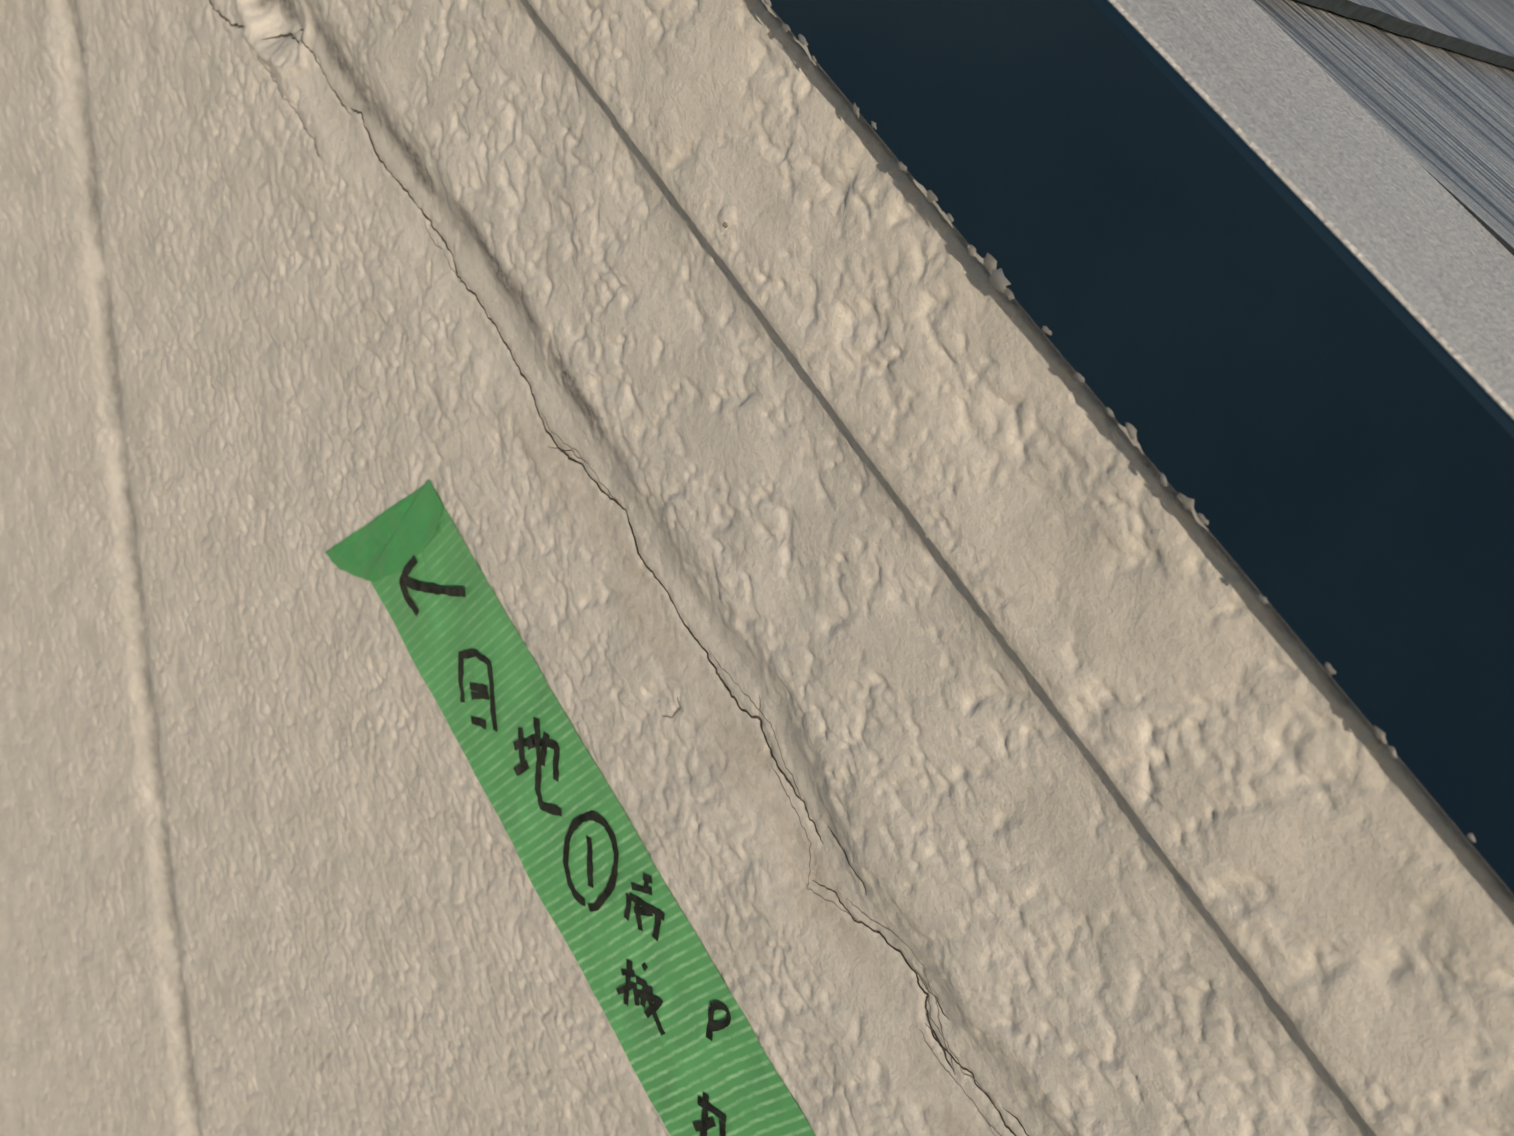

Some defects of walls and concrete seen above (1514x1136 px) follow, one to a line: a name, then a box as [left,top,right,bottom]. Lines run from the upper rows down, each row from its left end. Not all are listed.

crack [209,0,1029,1136]